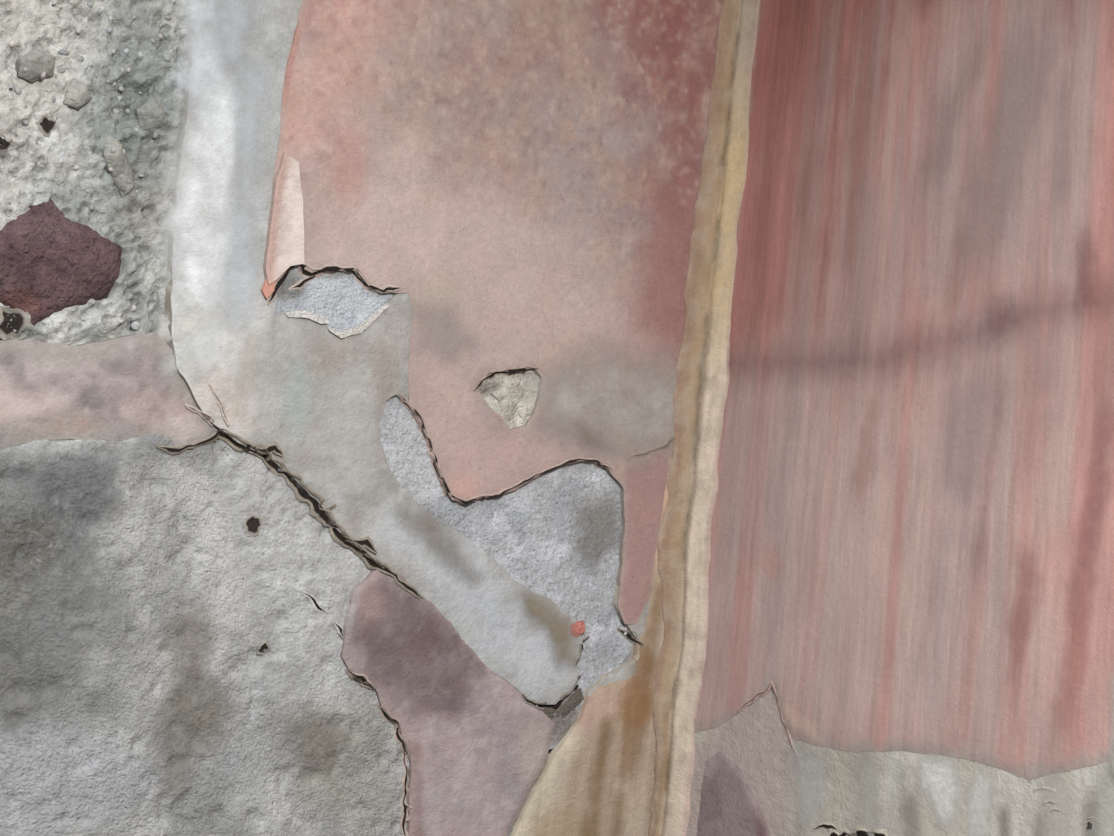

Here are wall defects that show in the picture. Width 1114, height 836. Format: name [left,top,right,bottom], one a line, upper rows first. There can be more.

flaking render [282,21,300,107]
spalling [261,153,395,338]
spalling [477,370,539,429]
spalling [257,640,270,655]
crack [156,384,426,603]
spalling [379,395,634,749]